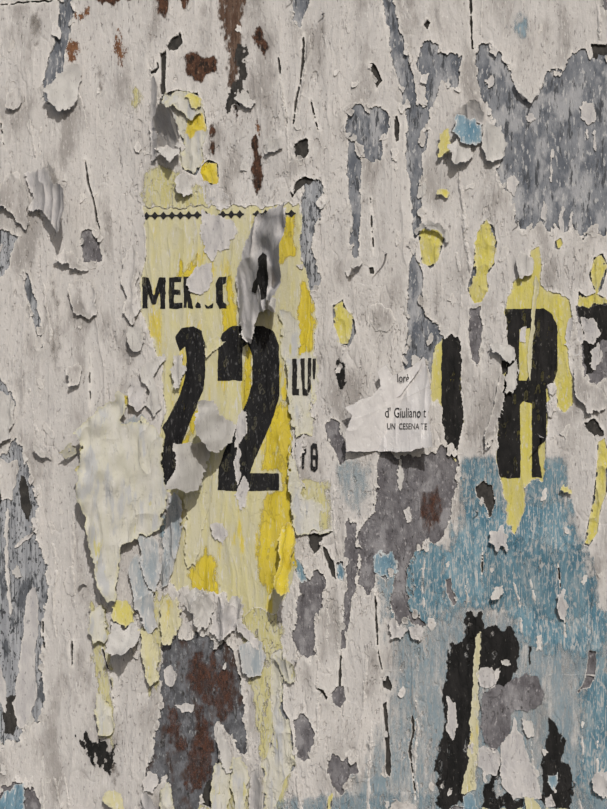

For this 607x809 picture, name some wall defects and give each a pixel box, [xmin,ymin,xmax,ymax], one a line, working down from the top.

peeling [5,88,22,110]
rust [185,0,269,117]
peeling [0,229,18,277]
peeling [20,270,44,351]
peeling [0,160,68,233]
rust [251,122,264,196]
peeling [343,0,607,379]
peeling [325,419,346,465]
peeling [0,354,266,809]
peeling [273,522,326,660]
peeling [337,443,461,649]
rust [165,650,234,793]